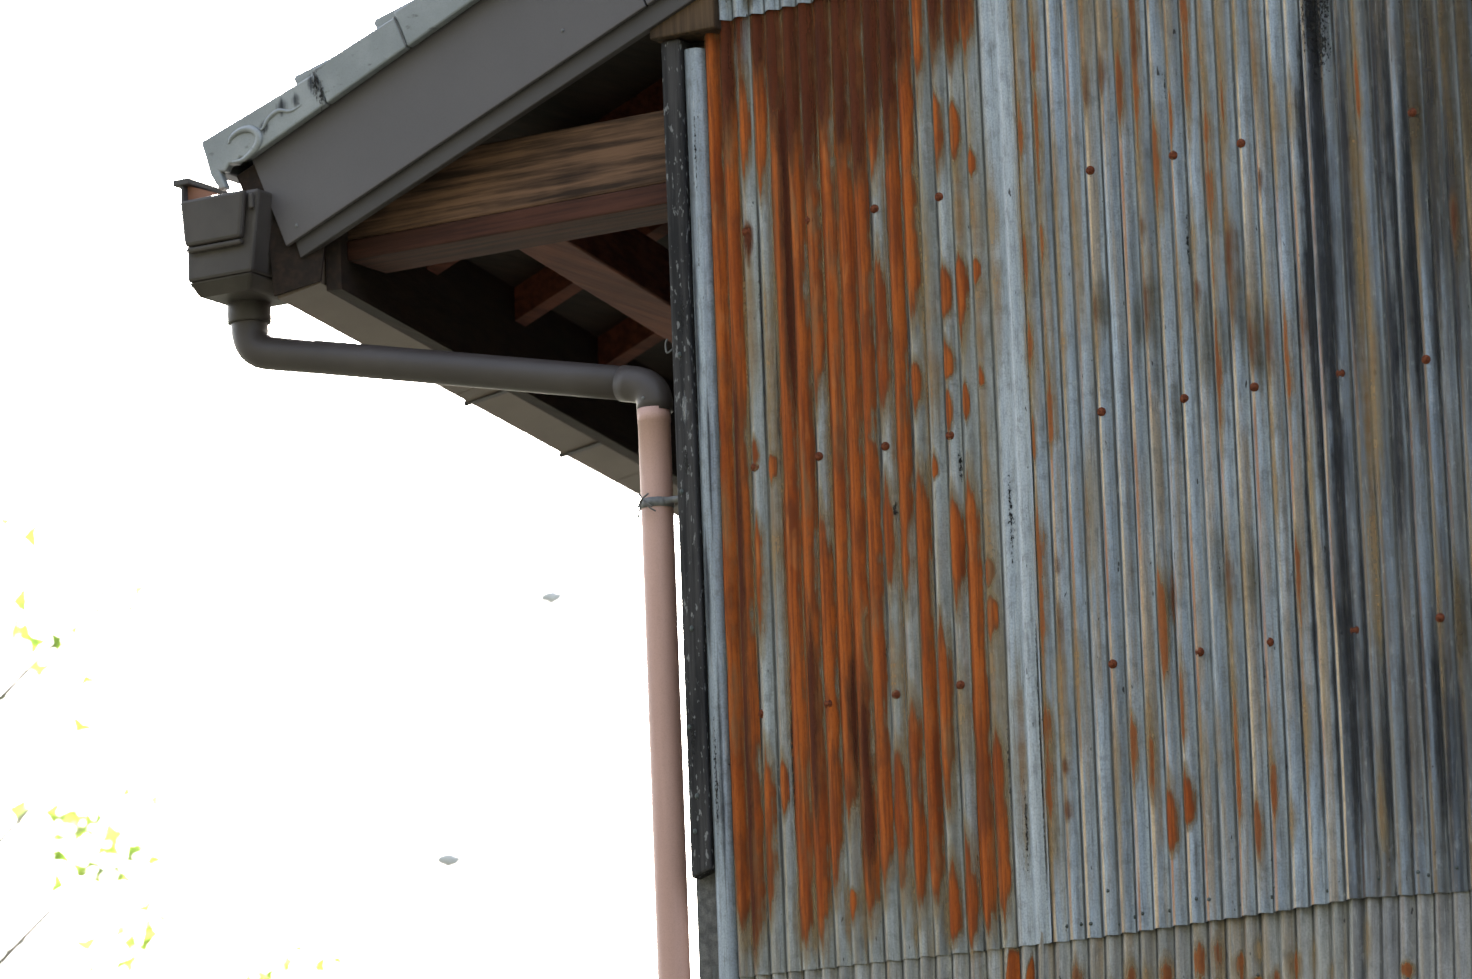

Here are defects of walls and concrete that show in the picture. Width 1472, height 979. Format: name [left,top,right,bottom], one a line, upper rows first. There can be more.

corrosion [1009,0,1056,463]
corrosion [704,0,1035,979]
corrosion [1034,485,1070,880]
corrosion [1071,960,1084,979]
corrosion [1125,956,1174,979]
corrosion [1194,937,1315,979]